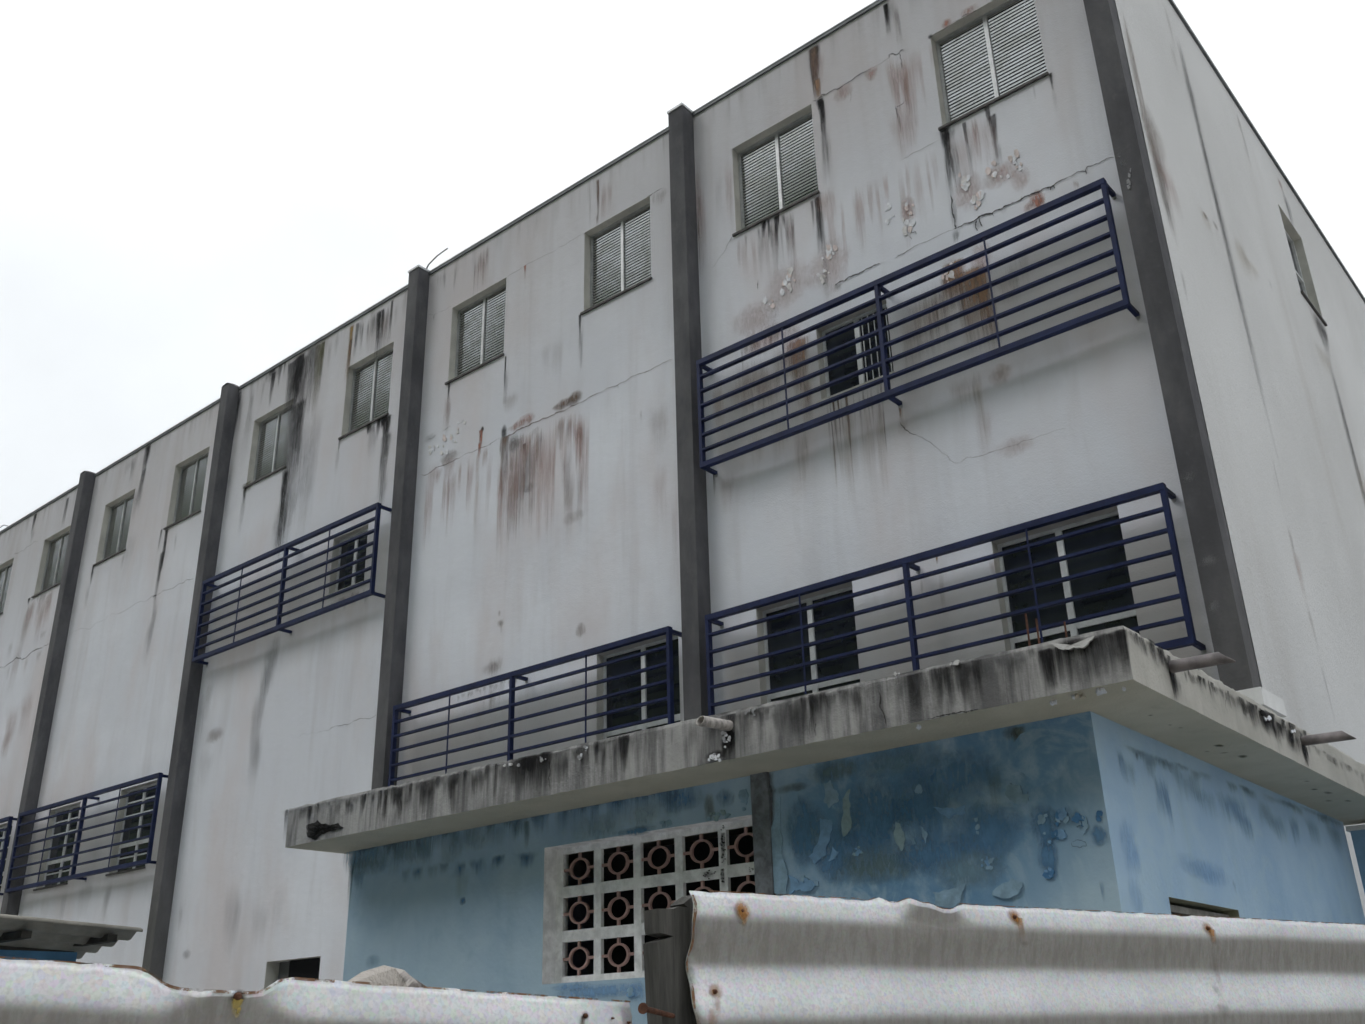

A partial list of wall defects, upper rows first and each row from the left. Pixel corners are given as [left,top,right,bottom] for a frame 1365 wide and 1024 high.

peeling [958,149,1023,210]
crack [835,157,1111,285]
corrosion [941,260,989,324]
leakage [269,342,325,530]
crack [424,361,667,476]
leakage [907,660,981,698]
leakage [1040,629,1309,763]
leakage [346,764,497,811]
leakage [515,752,550,780]
leakage [619,735,629,756]
leakage [708,714,735,762]
peeling [1032,807,1106,879]